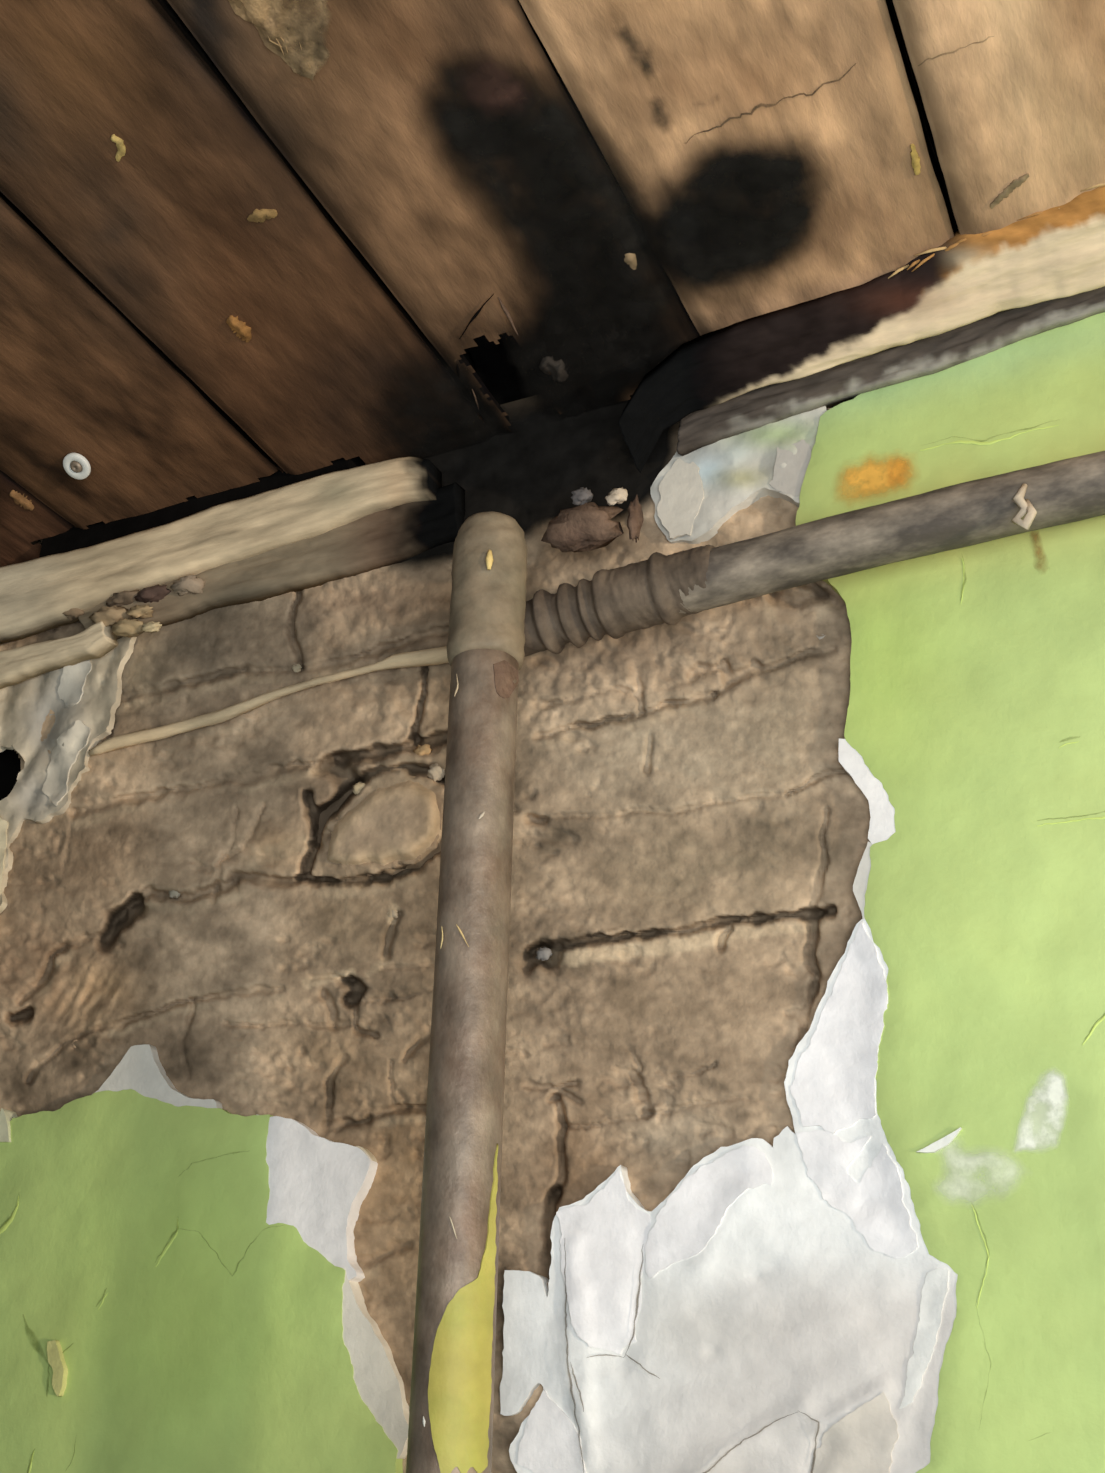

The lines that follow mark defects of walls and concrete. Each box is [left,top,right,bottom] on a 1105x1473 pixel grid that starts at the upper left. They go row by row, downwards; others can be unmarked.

crack [687,63,856,142]
rust [842,459,912,497]
spalling [0,556,453,1473]
spalling [491,580,958,1473]